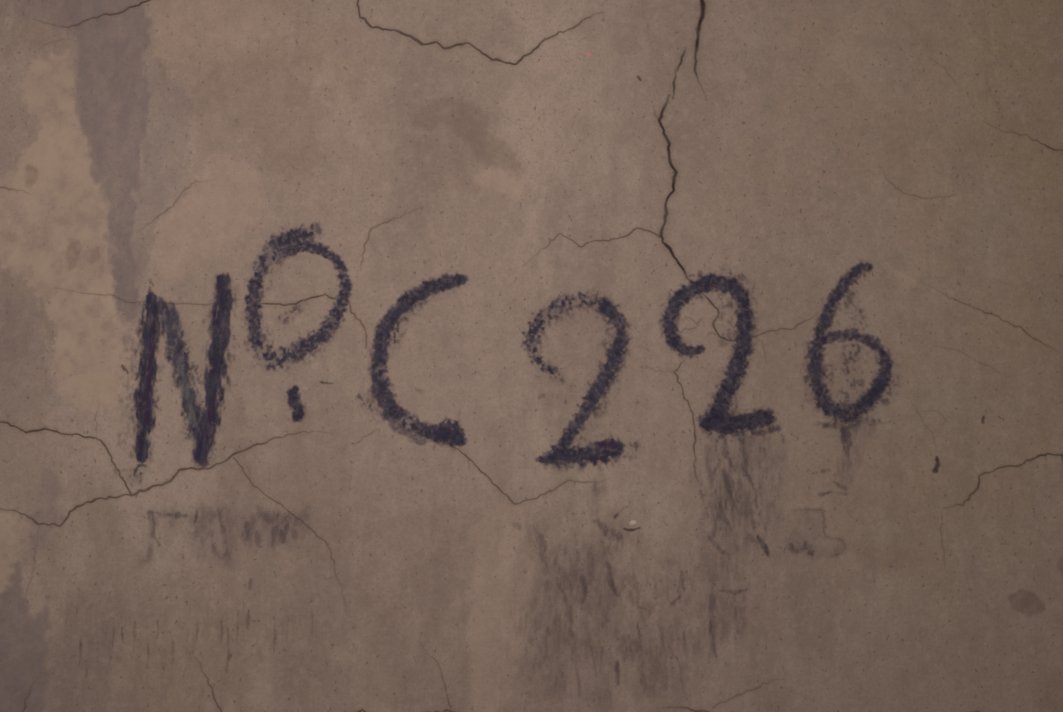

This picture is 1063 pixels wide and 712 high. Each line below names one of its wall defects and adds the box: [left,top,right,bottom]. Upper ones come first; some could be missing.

crack [357,1,561,65]
crack [587,0,705,272]
crack [1,421,107,449]
crack [41,443,260,525]